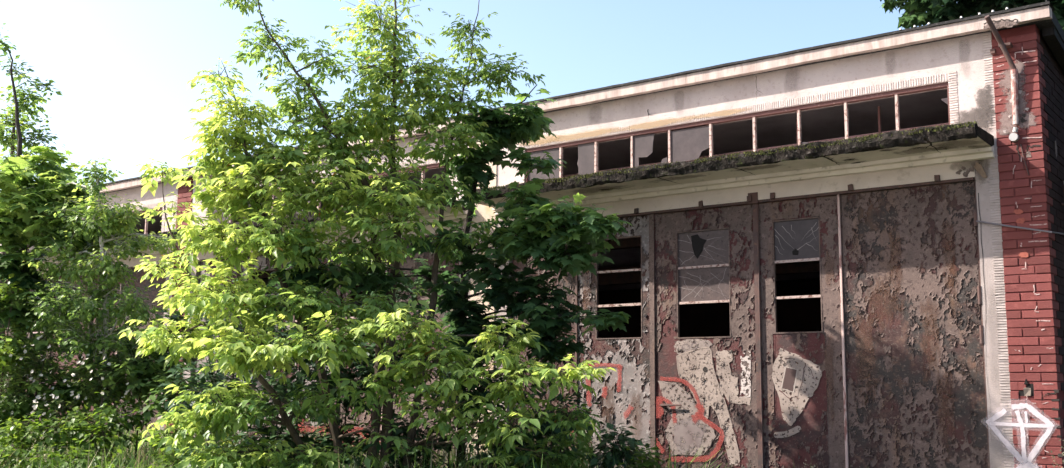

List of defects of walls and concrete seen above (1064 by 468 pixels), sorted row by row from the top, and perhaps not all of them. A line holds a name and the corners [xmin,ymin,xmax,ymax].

leakage [957,85,994,132]
spalling [994,47,1043,174]
peeling [1014,180,1047,269]
peeling [522,163,988,468]